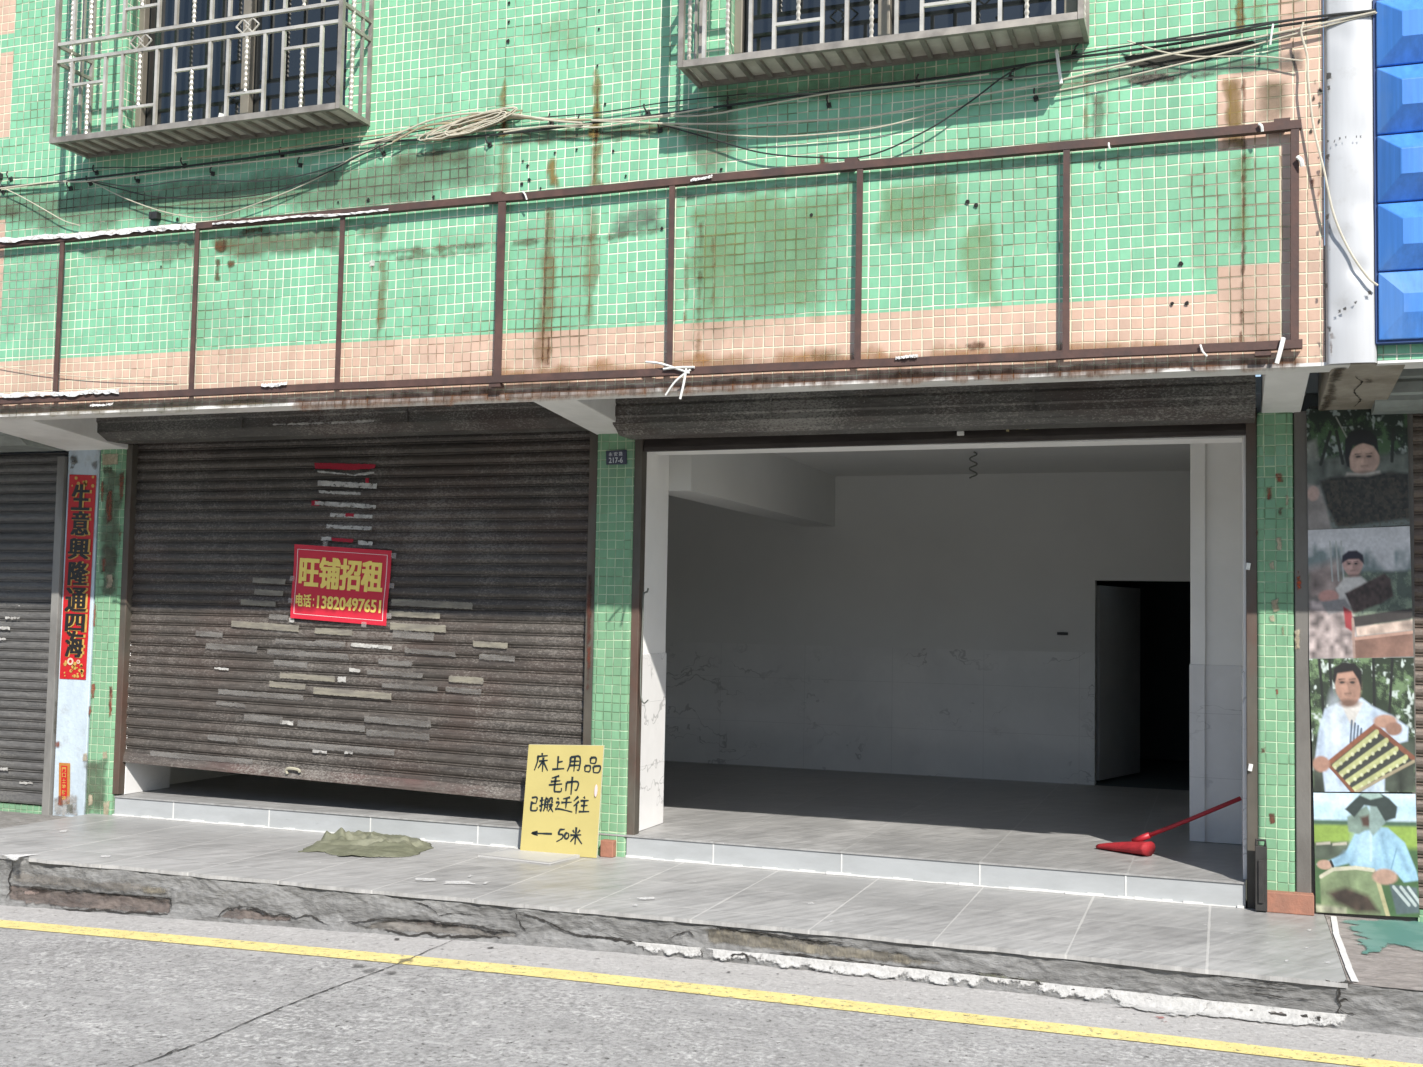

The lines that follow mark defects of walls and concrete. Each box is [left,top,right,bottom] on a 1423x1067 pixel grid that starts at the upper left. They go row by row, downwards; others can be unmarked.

corrosion [1235,0,1245,35]
corrosion [547,159,557,184]
corrosion [589,75,602,185]
corrosion [1224,81,1246,207]
leakage [529,229,590,345]
leakage [686,189,837,332]
corrosion [298,213,1298,410]
corrosion [0,402,203,416]
corrosion [220,398,279,407]
spalling [2,854,172,915]
spalling [218,906,518,938]
spalling [702,925,942,972]